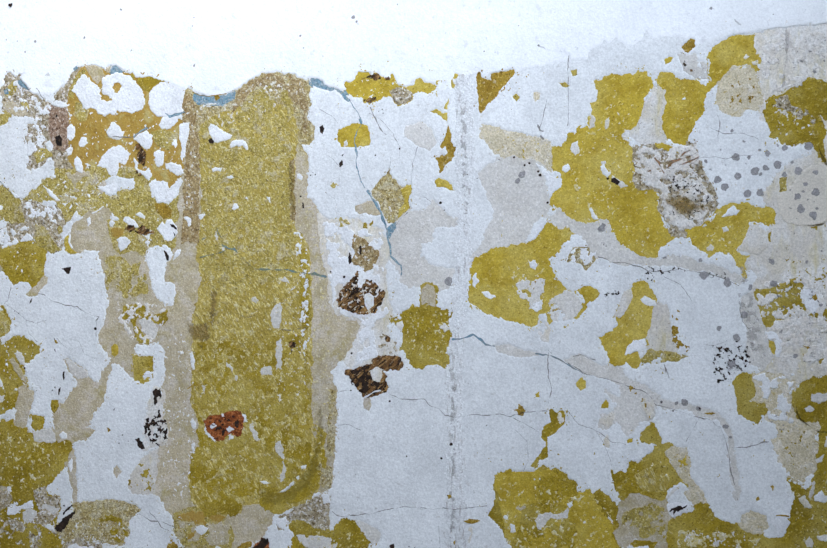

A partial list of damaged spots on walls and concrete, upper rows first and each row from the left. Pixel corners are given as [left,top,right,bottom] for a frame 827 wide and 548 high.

peeling [0,55,458,548]
crack [337,101,408,275]
peeling [464,19,827,548]